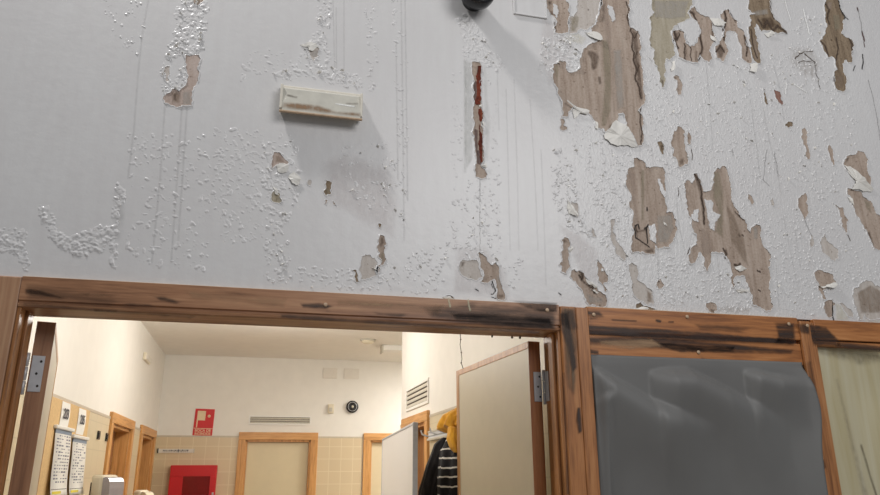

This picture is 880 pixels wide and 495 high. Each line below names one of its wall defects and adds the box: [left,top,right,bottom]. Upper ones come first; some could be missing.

peeling [162,54,202,108]
peeling [818,0,854,93]
peeling [546,0,787,313]
peeling [827,145,880,251]
peeling [352,223,388,283]
peeling [457,251,507,301]